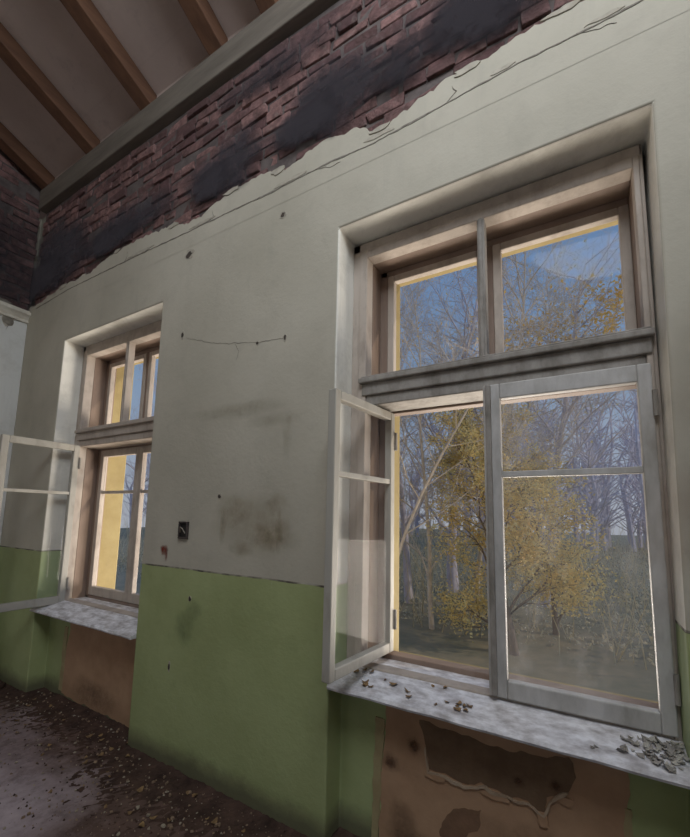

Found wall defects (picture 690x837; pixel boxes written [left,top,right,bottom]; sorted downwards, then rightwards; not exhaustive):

flaking render [0,0,584,311]
crack [36,0,643,309]
spalling [2,315,14,327]
peeling [58,623,136,733]
peeling [371,706,633,837]